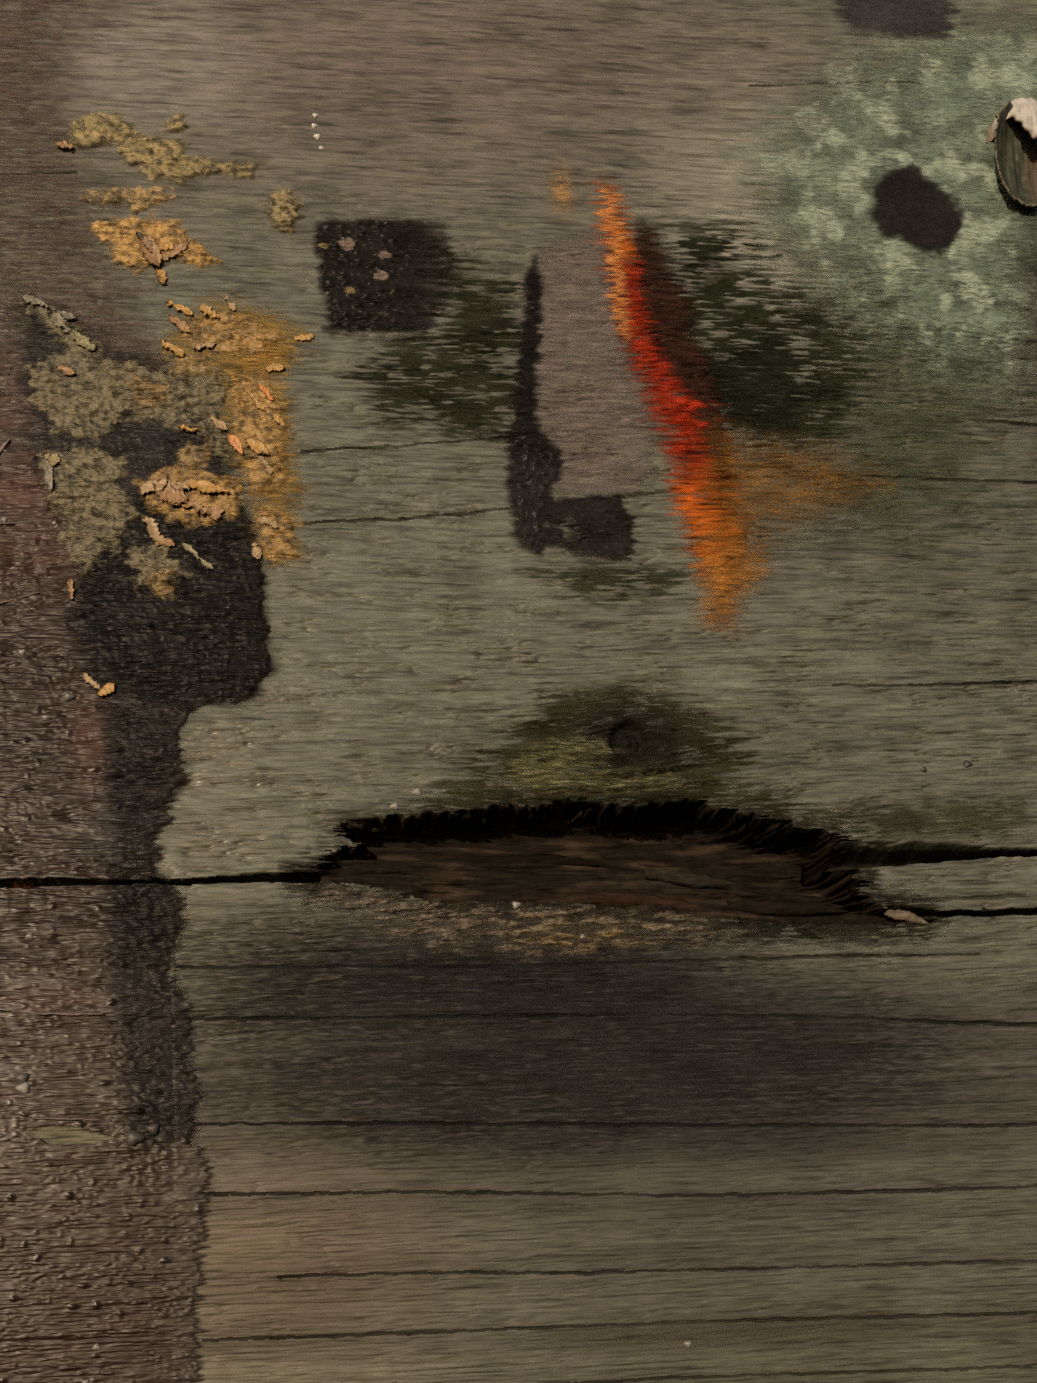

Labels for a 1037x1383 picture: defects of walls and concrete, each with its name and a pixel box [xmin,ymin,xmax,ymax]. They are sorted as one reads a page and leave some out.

water stain [505,260,562,554]
corrosion [596,187,871,609]
peeling [0,0,274,1383]
crack [827,849,1037,872]
crack [158,873,312,886]
crack [901,893,1037,920]
crack [175,962,436,970]
crack [573,952,982,965]